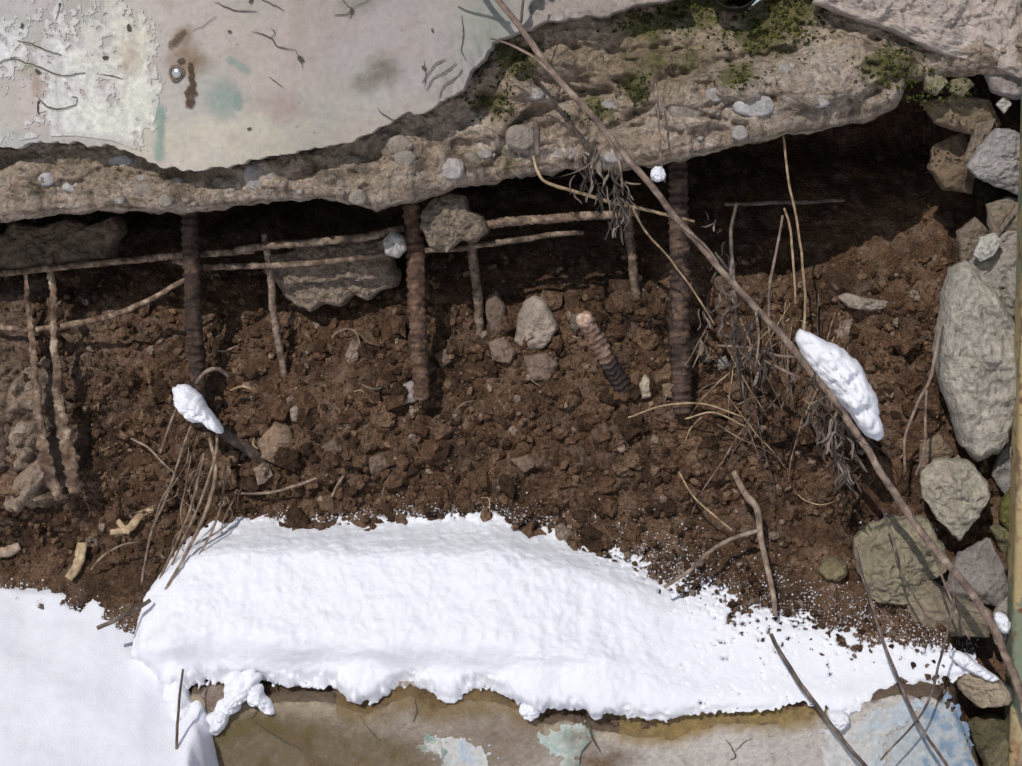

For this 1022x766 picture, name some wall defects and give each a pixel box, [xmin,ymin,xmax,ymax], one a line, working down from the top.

spalling [0,0,1022,223]
spalling [0,311,91,511]
peeling [414,729,499,766]
peeling [537,720,595,766]
peeling [819,691,975,766]